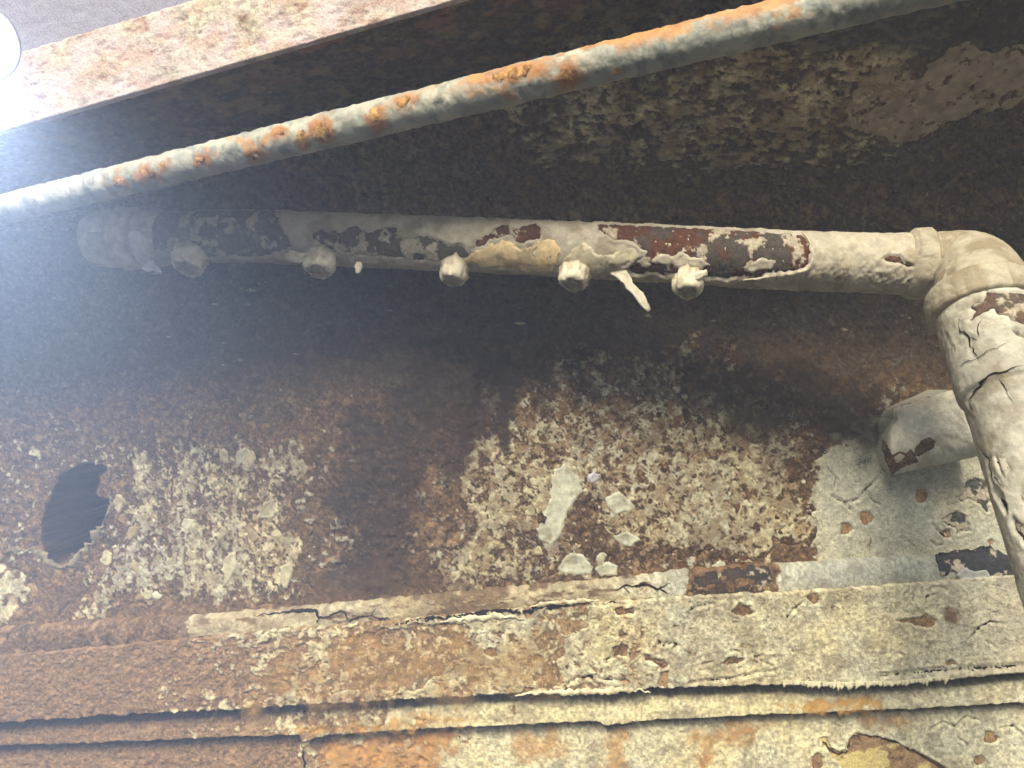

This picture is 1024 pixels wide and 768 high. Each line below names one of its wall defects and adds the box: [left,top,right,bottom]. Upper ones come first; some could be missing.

peeling [312,223,541,274]
peeling [598,224,814,312]
crack [946,319,1022,410]
peeling [419,329,828,592]
corrosion [881,437,936,475]
peeling [55,408,331,622]
corrosion [841,512,873,534]
crack [254,608,386,623]
crack [589,583,670,606]
corrosion [691,564,773,595]
corrosion [323,714,461,768]
peeling [811,733,944,768]